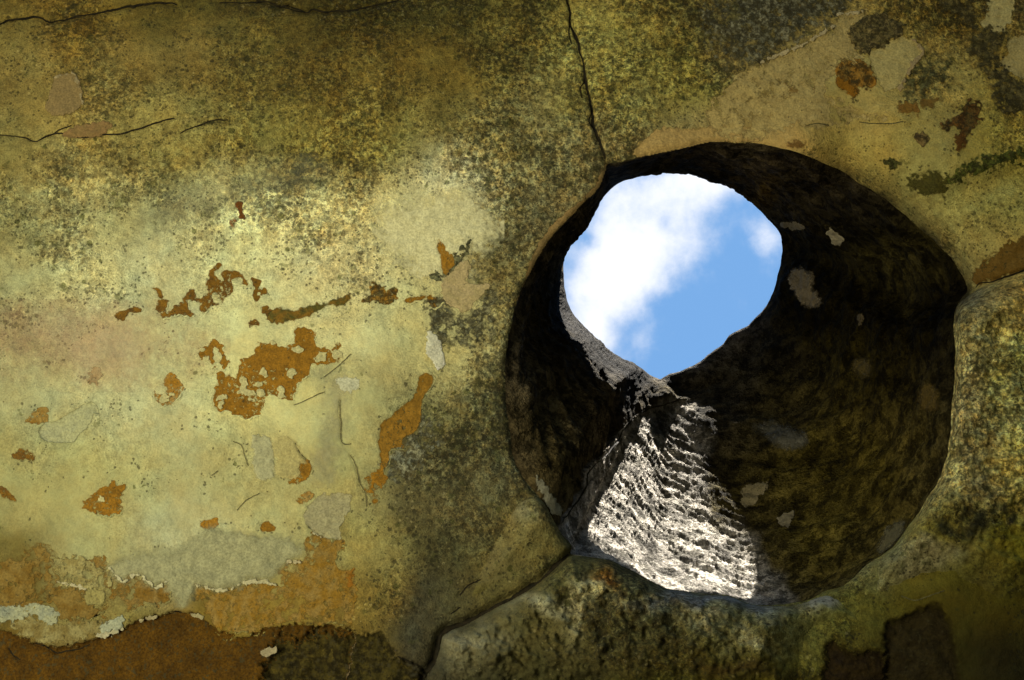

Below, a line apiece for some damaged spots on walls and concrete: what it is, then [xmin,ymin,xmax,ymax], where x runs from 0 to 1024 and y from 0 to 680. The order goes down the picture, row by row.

crack [0,2,177,25]
crack [219,0,399,13]
crack [566,0,606,159]
rust [835,58,877,98]
crack [0,118,228,142]
rust [934,98,984,152]
spalling [0,517,422,680]